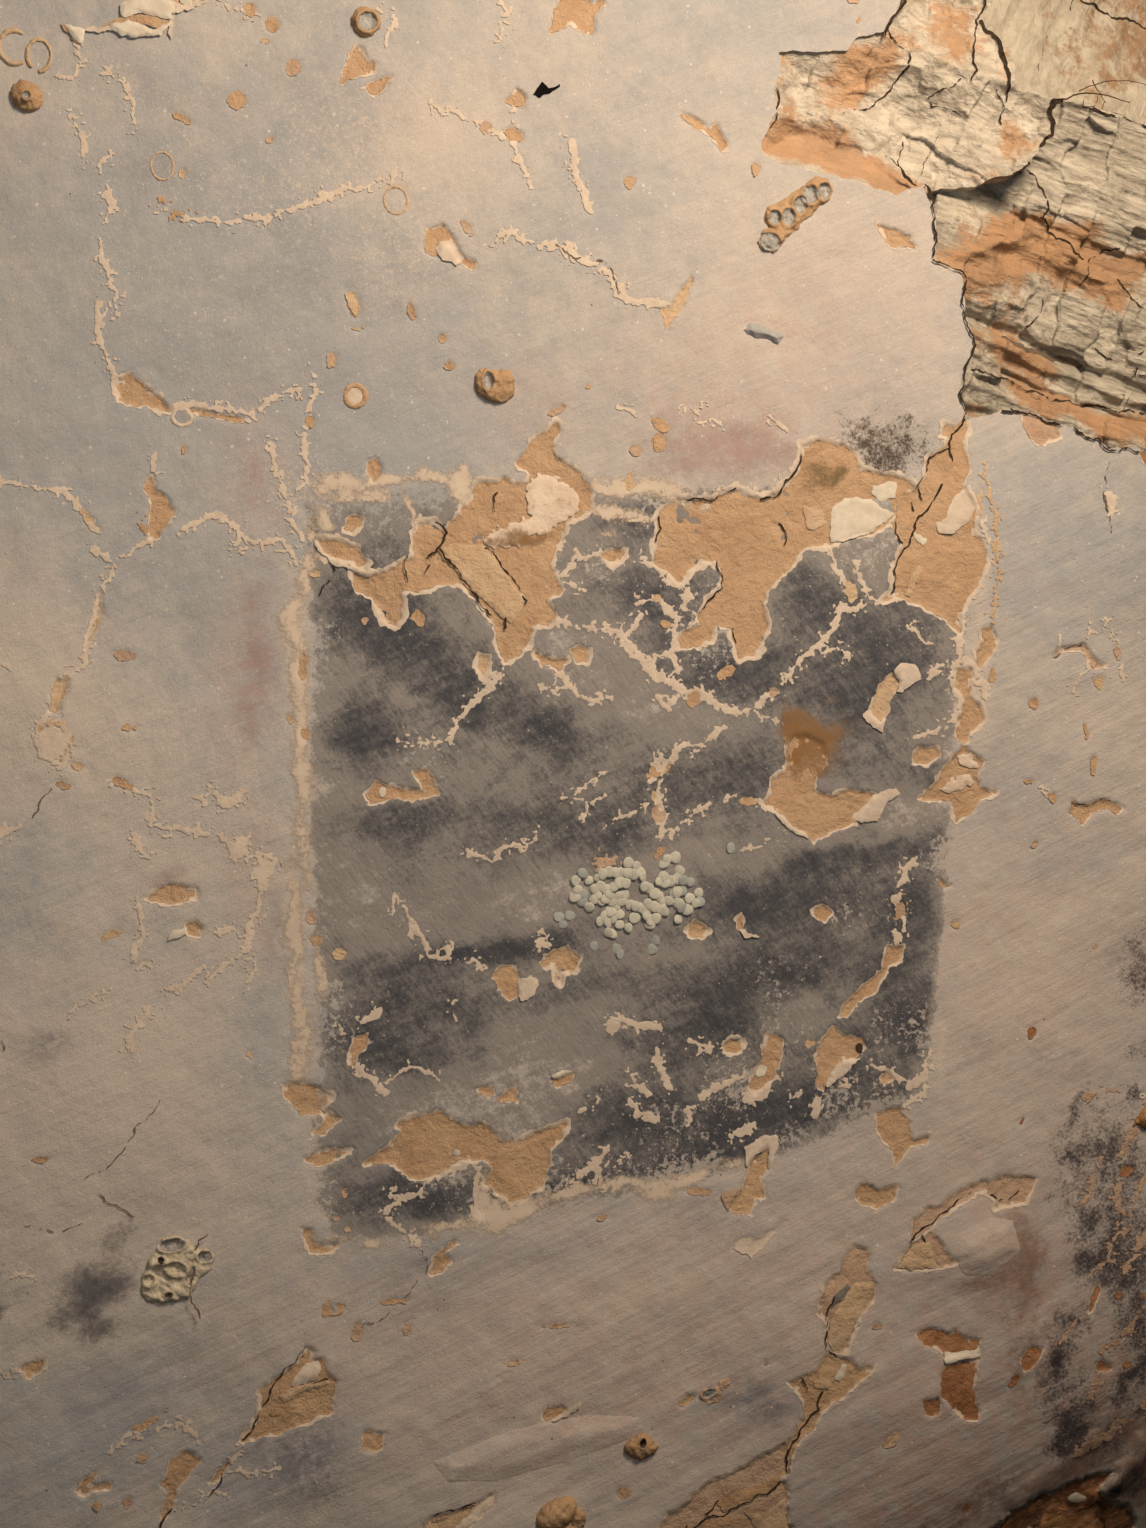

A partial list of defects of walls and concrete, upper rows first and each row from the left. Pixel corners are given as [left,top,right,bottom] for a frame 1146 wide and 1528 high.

flaking render [55,0,280,135]
crack [768,88,780,131]
crack [844,0,1146,594]
damp [814,464,846,486]
damp [843,415,929,472]
flaking render [0,108,1005,1278]
flaking render [893,1172,1037,1273]
peeling [1009,1103,1146,1404]
flaking render [106,1345,338,1521]
flaking render [656,1243,883,1528]
flaking render [914,1327,983,1422]
flaking render [993,1471,1136,1528]